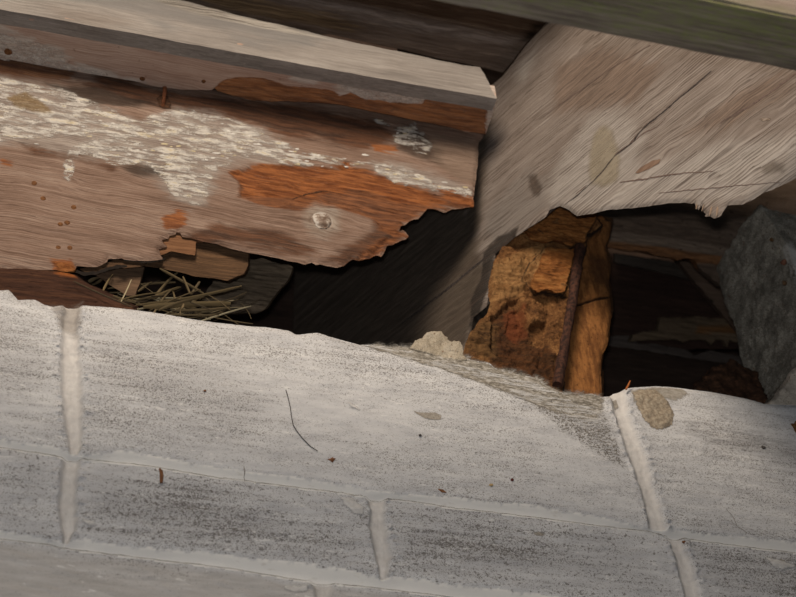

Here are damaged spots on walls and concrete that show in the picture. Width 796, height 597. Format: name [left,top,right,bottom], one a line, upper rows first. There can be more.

peeling [0,77,472,205]
crack [0,447,795,553]